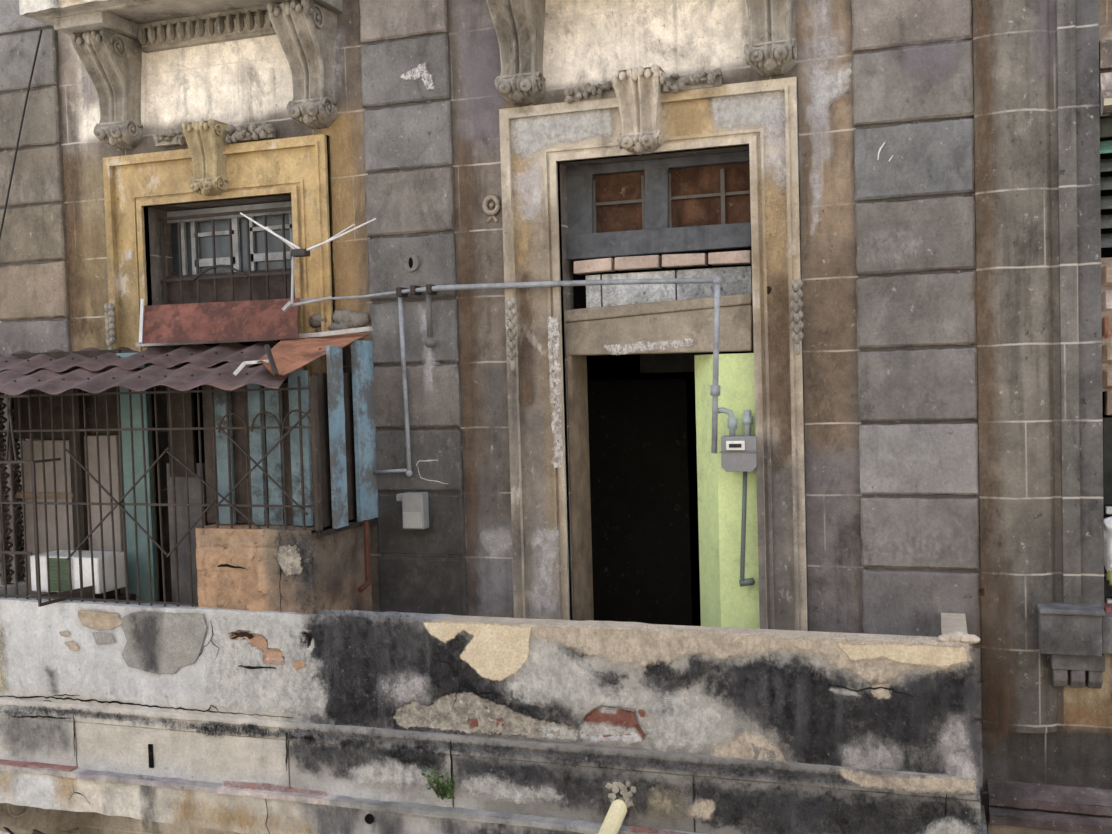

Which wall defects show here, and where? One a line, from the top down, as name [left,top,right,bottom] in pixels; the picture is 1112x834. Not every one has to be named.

water stain [519,273,533,403]
water stain [531,533,558,615]
flaking render [59,631,79,651]
peeling [78,610,328,716]
water stain [0,610,1012,834]
peeling [393,622,971,770]